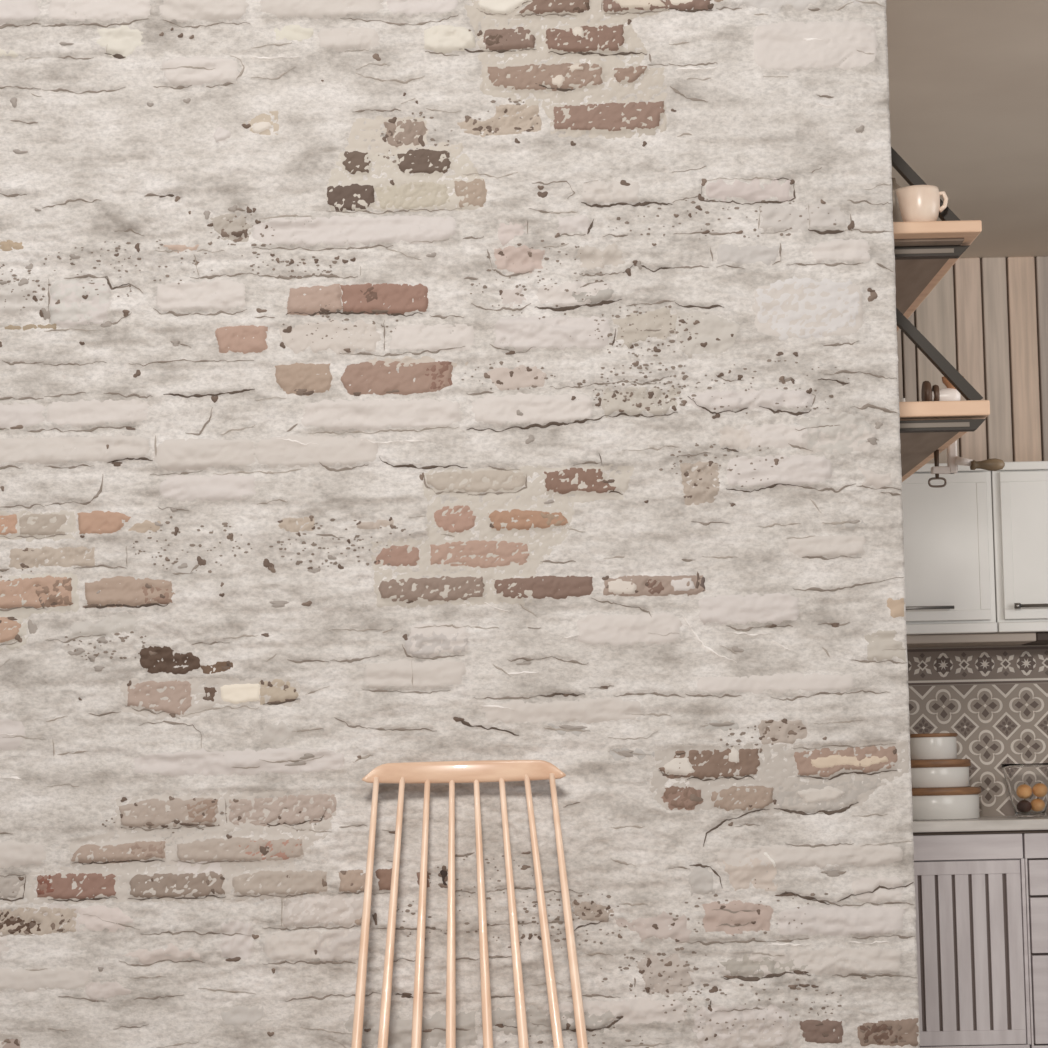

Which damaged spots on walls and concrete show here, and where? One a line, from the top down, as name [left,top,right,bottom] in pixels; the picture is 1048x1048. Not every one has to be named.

peeling [325,0,723,214]
spalling [181,205,428,354]
spalling [275,348,556,396]
peeling [263,464,706,609]
spalling [65,631,301,720]
peeling [650,718,910,817]
peeling [0,790,392,936]